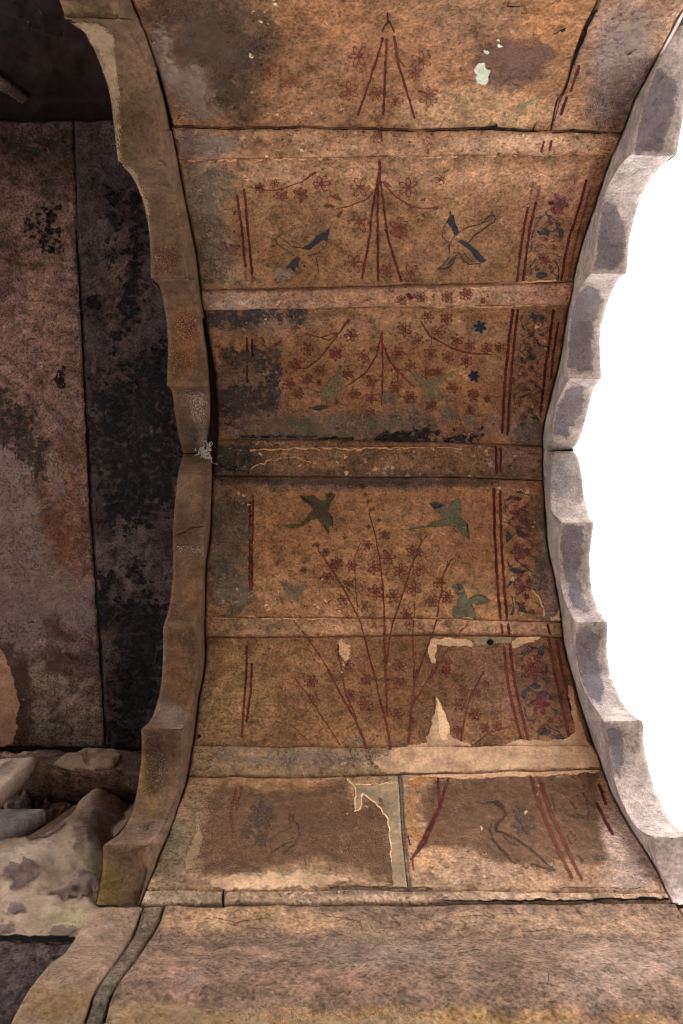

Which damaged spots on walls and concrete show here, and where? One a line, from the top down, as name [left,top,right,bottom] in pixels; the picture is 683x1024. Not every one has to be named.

crack [171,9,603,134]
water stain [475,41,553,90]
peeling [212,587,351,673]
peeling [428,636,541,664]
peeling [346,685,600,889]
crack [330,885,669,933]